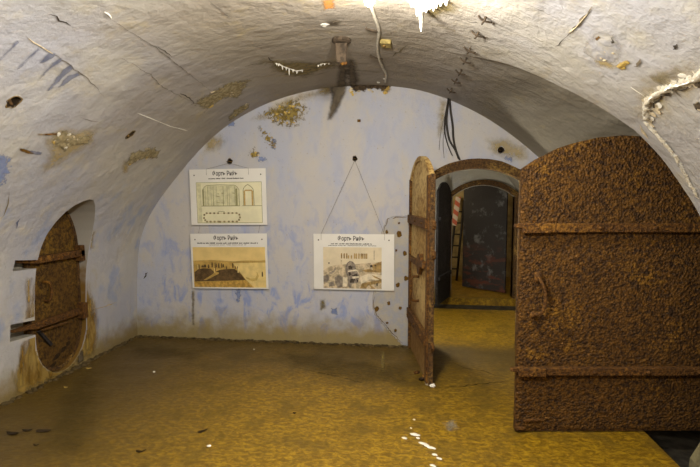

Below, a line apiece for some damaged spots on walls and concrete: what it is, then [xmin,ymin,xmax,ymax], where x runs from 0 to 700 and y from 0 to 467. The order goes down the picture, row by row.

efflorescence [408,0,452,32]
crack [557,7,592,46]
crack [30,39,101,94]
crack [105,12,211,91]
peeling [182,80,251,108]
leakage [320,60,358,118]
leakage [264,99,309,127]
spalling [51,131,92,165]
peeling [125,147,160,171]